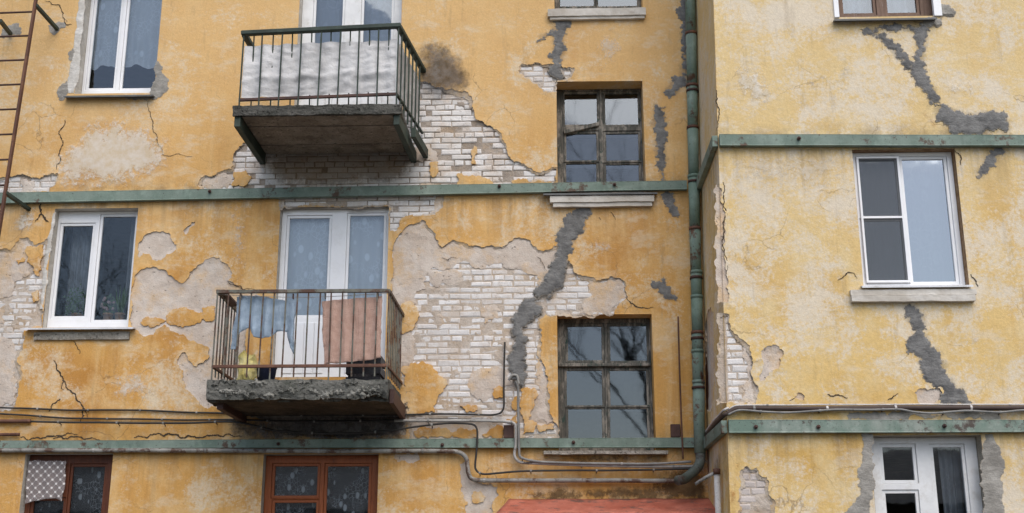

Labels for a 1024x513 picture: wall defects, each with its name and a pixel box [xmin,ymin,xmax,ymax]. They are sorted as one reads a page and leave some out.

damp [423,47,464,97]
crack [536,21,572,82]
crack [653,0,687,218]
crack [861,22,1009,179]
flaking render [0,237,50,412]
crack [21,342,99,440]
flaking render [130,232,382,409]
flaking render [198,80,628,439]
crack [507,208,616,389]
flaking render [706,185,784,411]
crack [904,303,972,404]
flaking render [738,466,776,513]